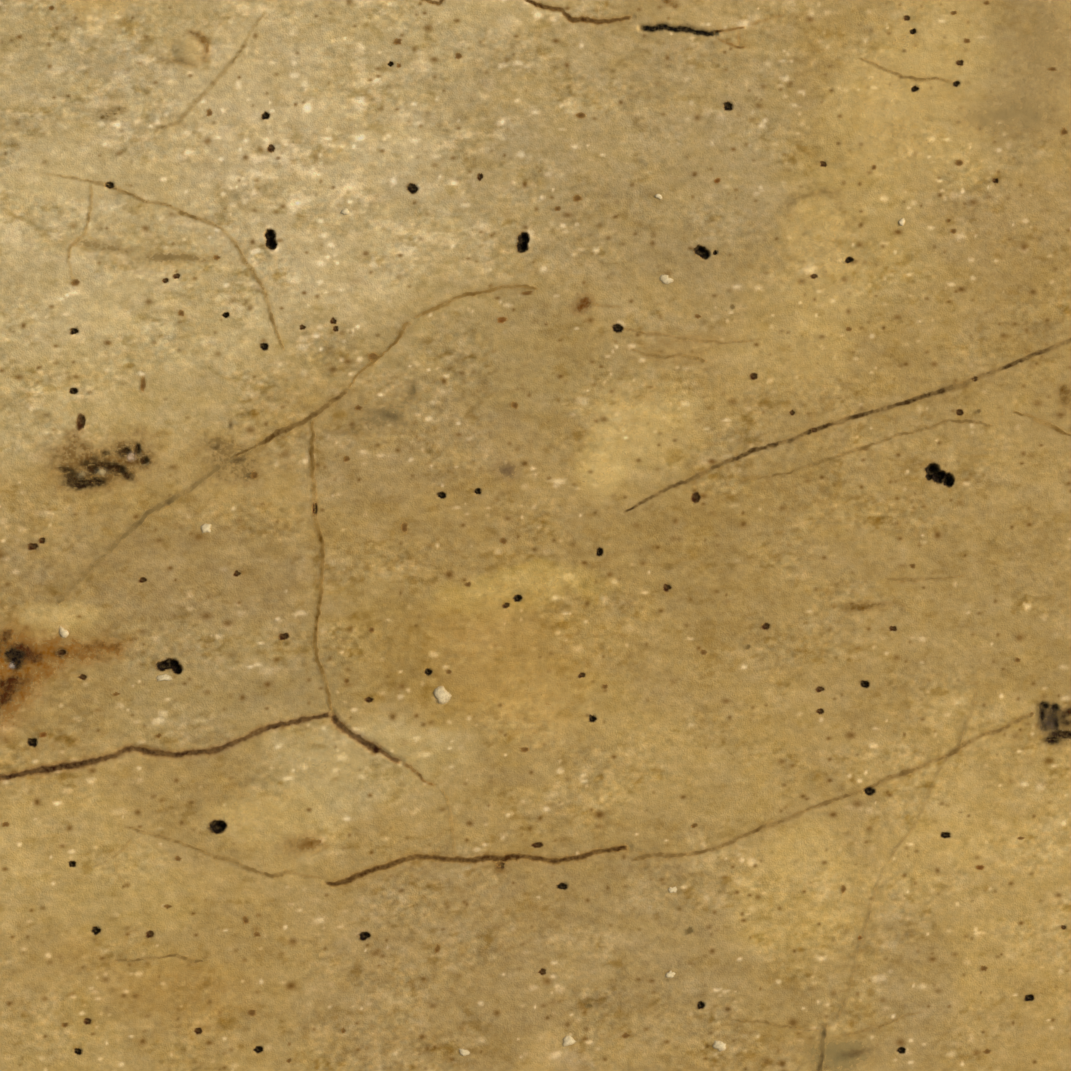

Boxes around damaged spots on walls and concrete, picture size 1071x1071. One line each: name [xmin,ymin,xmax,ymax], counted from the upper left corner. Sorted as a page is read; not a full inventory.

crack [422,0,444,8]
crack [525,0,744,49]
crack [639,331,711,363]
crack [625,338,1071,512]
crack [0,284,536,793]
corrosion [0,629,123,727]
crack [326,712,1034,886]
crack [129,827,279,878]